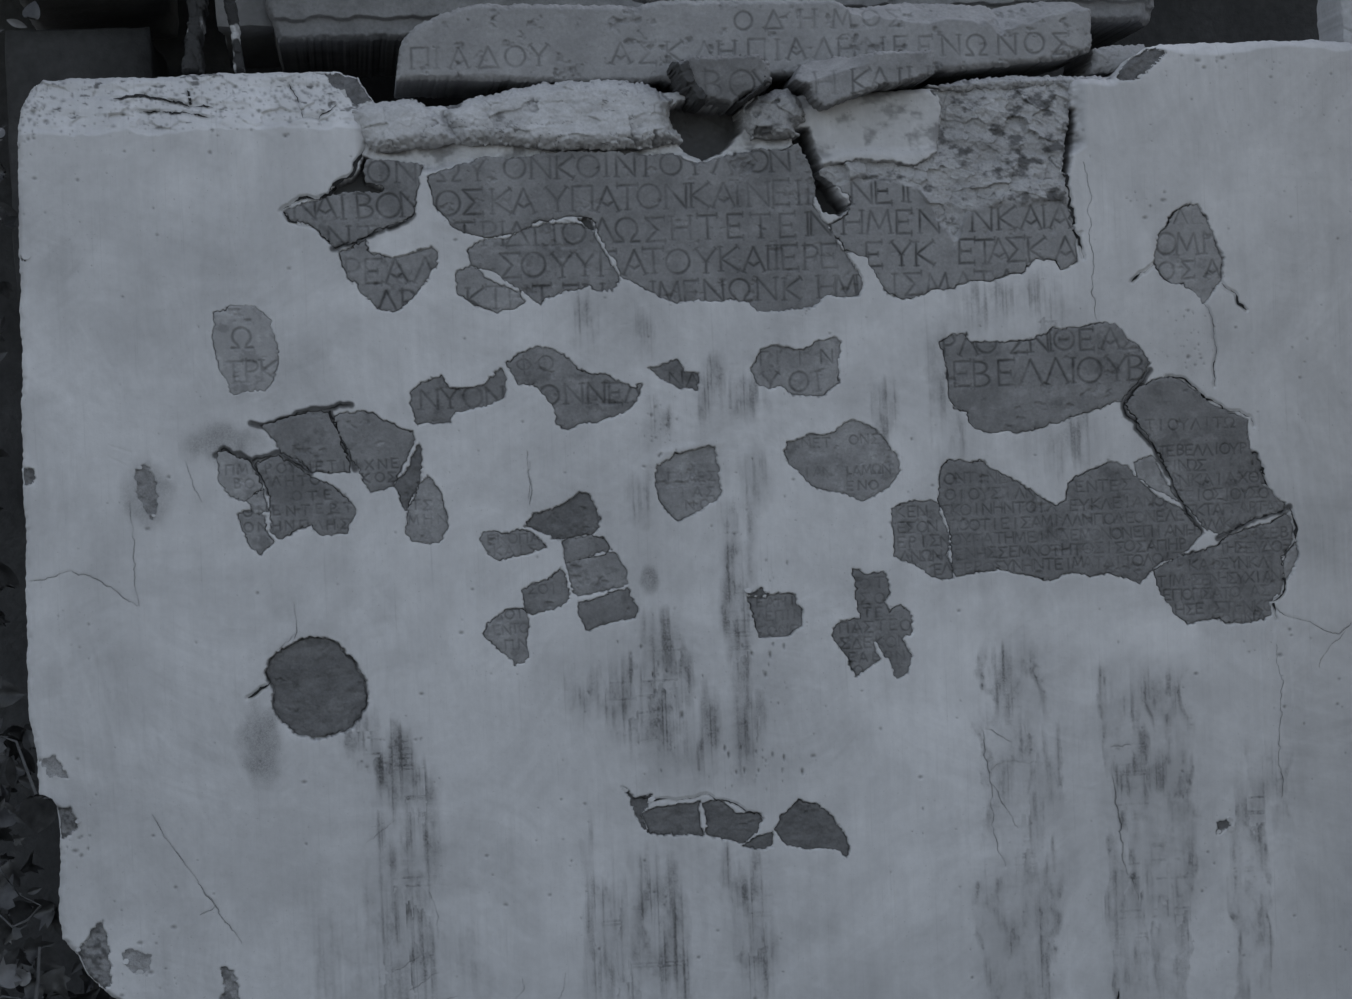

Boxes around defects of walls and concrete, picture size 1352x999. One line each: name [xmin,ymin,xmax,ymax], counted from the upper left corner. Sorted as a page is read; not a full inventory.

spalling [621,787,655,833]
water stain [660,901,685,974]